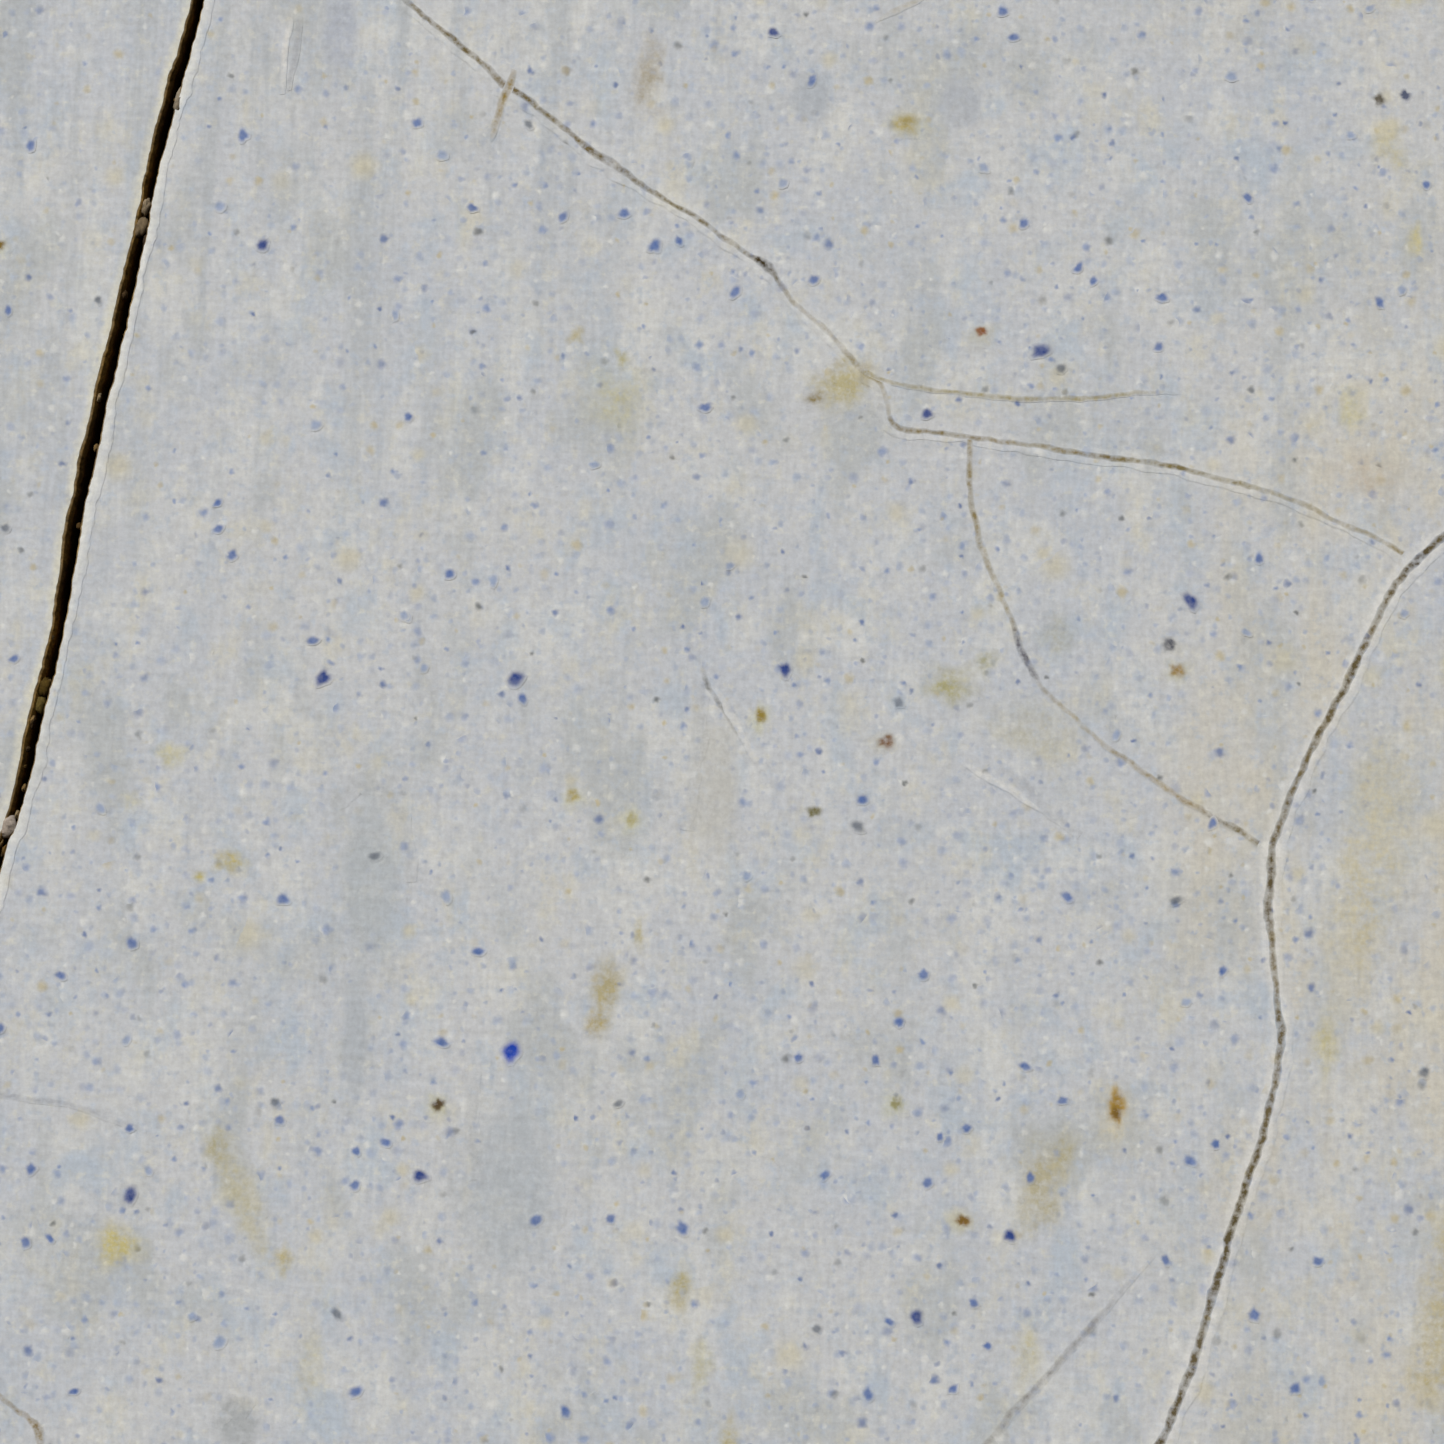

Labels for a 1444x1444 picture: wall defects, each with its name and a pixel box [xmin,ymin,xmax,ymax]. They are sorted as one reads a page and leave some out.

crack [279,16,294,94]
crack [0,0,214,912]
crack [395,0,1444,1444]
crack [0,1093,147,1134]
crack [0,1392,45,1444]